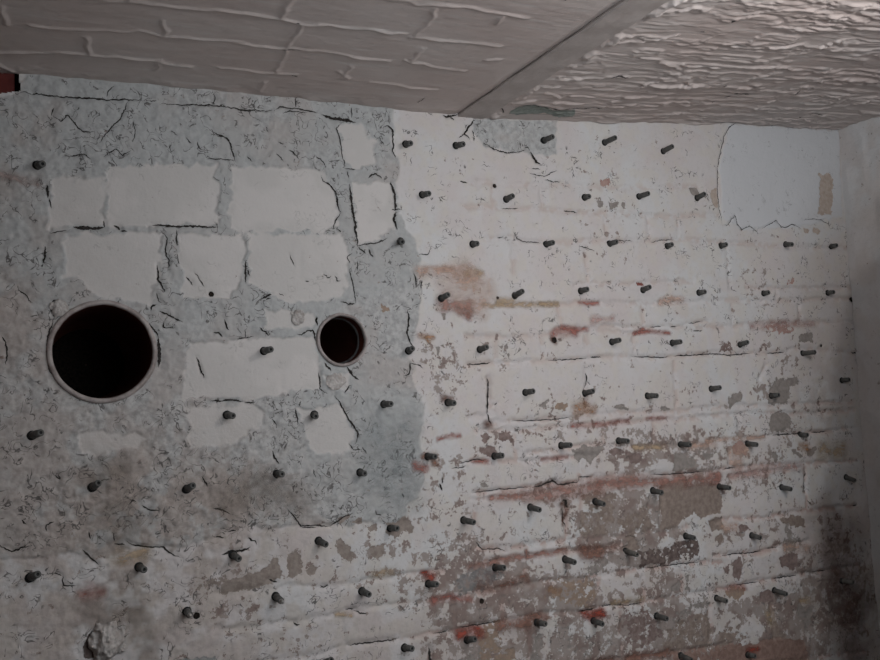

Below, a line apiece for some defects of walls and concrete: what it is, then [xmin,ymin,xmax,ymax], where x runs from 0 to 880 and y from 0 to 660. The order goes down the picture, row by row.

crack [26,76,400,305]
crack [149,224,215,367]
crack [213,319,269,339]
crack [213,397,254,405]
crack [318,363,366,452]
crack [469,362,497,423]
peeling [768,375,799,432]
peeling [479,430,515,457]
flaking render [544,440,724,609]
peeling [779,514,806,571]
peeling [723,556,746,601]
flaking render [621,574,808,660]